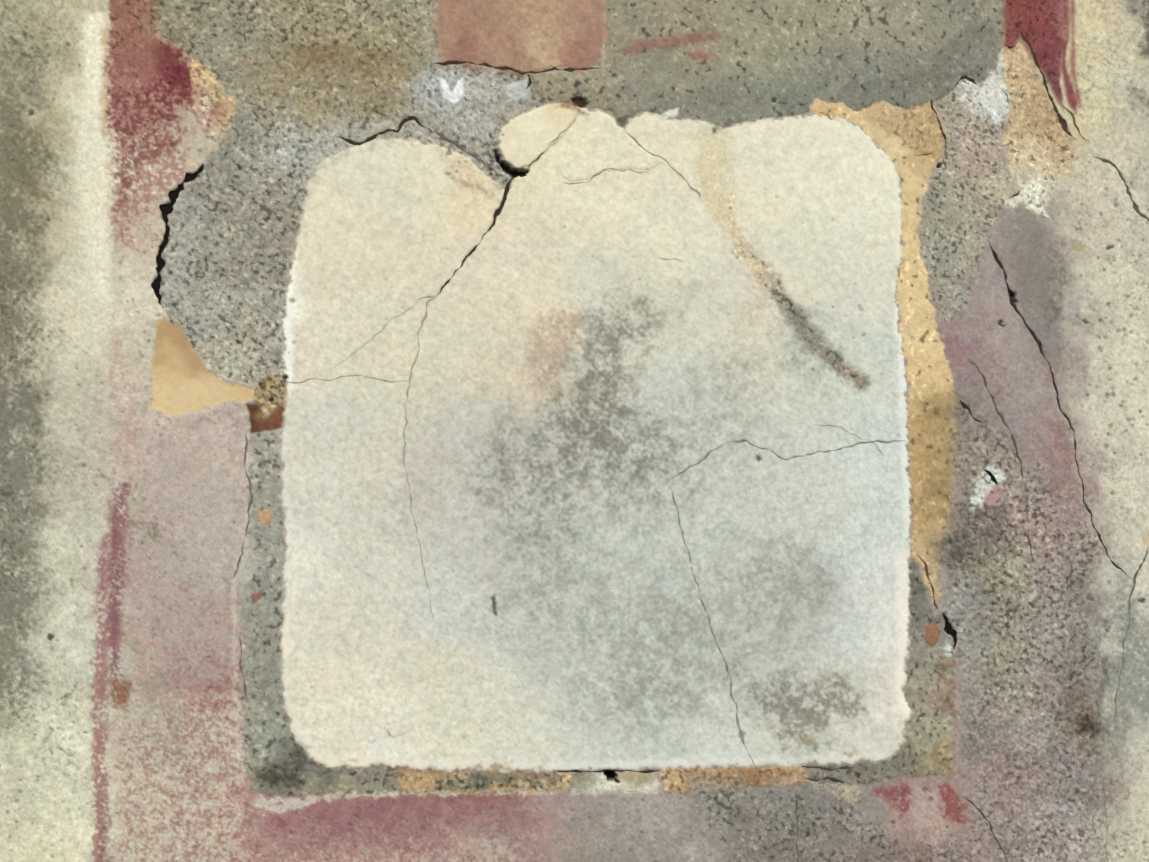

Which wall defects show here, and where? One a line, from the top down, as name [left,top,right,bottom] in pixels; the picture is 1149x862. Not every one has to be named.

crack [151,164,203,305]
spalling [154,0,664,385]
crack [559,130,701,197]
crack [920,100,946,156]
crack [955,76,1009,103]
crack [1007,31,1149,221]
crack [284,111,579,615]
crack [960,361,1034,559]
crack [988,240,1148,736]
crack [670,425,904,763]